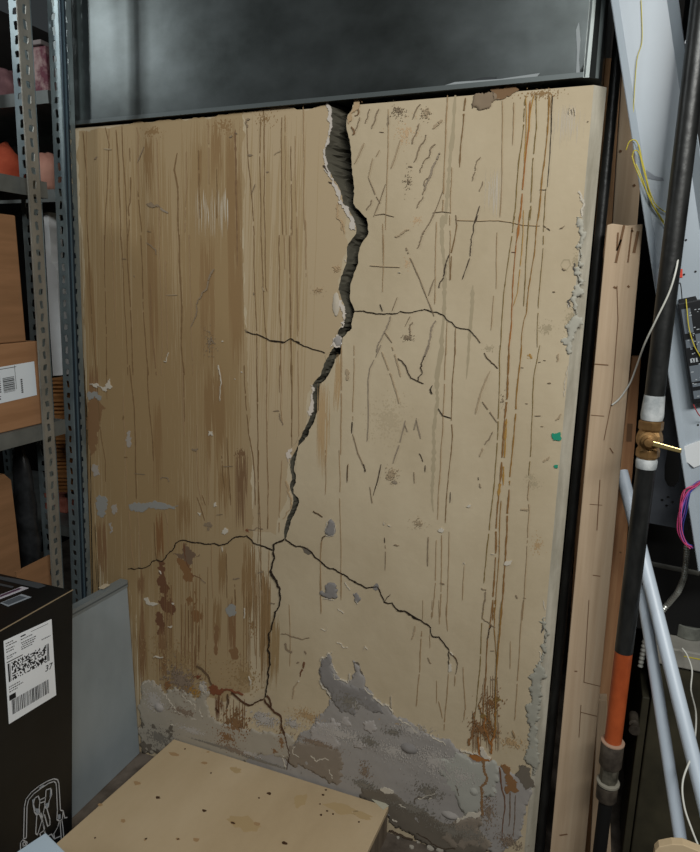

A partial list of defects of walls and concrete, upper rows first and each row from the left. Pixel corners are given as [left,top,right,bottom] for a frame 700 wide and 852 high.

spalling [472,86,519,110]
spalling [561,191,587,355]
leakage [76,95,523,852]
crack [128,103,498,769]
corrosion [462,94,553,816]
corrosion [155,511,251,755]
spalling [137,652,532,852]
corrosion [499,764,519,839]
spalling [524,600,550,775]